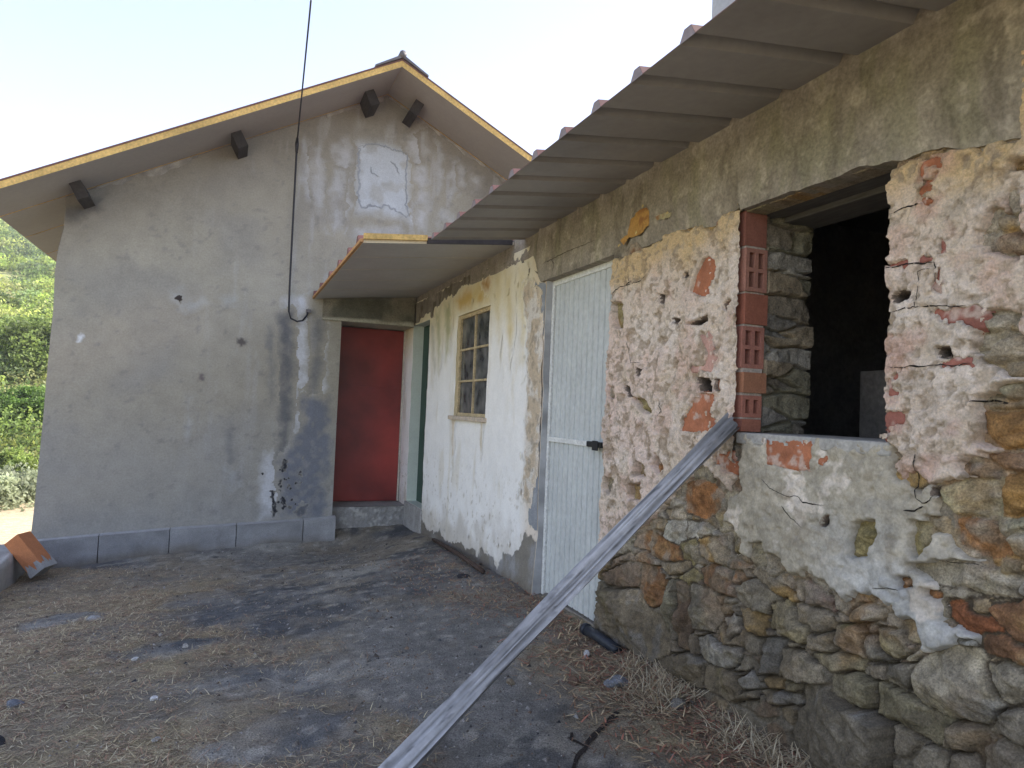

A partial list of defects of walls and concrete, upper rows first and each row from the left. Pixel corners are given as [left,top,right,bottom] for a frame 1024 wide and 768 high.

flaking render [693,257,716,296]
flaking render [890,239,947,294]
leakage [165,283,244,317]
flaking render [935,304,996,334]
crack [891,361,967,369]
flaking render [942,357,975,368]
leakage [218,291,335,522]
flaking render [415,260,544,594]
flaking render [680,390,716,433]
flaking render [879,411,905,442]
flaking render [761,437,828,472]
crack [763,481,817,520]